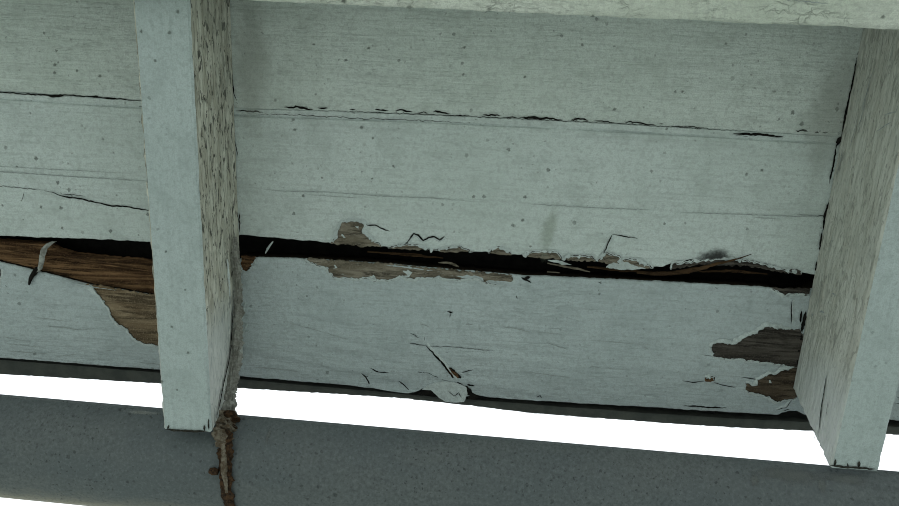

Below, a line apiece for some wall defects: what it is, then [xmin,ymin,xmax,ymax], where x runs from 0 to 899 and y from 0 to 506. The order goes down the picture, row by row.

crack [0,92,138,101]
peeling [28,241,57,285]
peeling [329,217,473,253]
peeling [305,257,515,287]
crack [232,51,898,366]
peeling [64,279,159,348]
crack [215,300,234,422]
crack [360,324,624,400]
crack [684,377,756,408]
peeling [708,322,803,404]
crack [776,400,791,411]
crack [813,375,828,439]